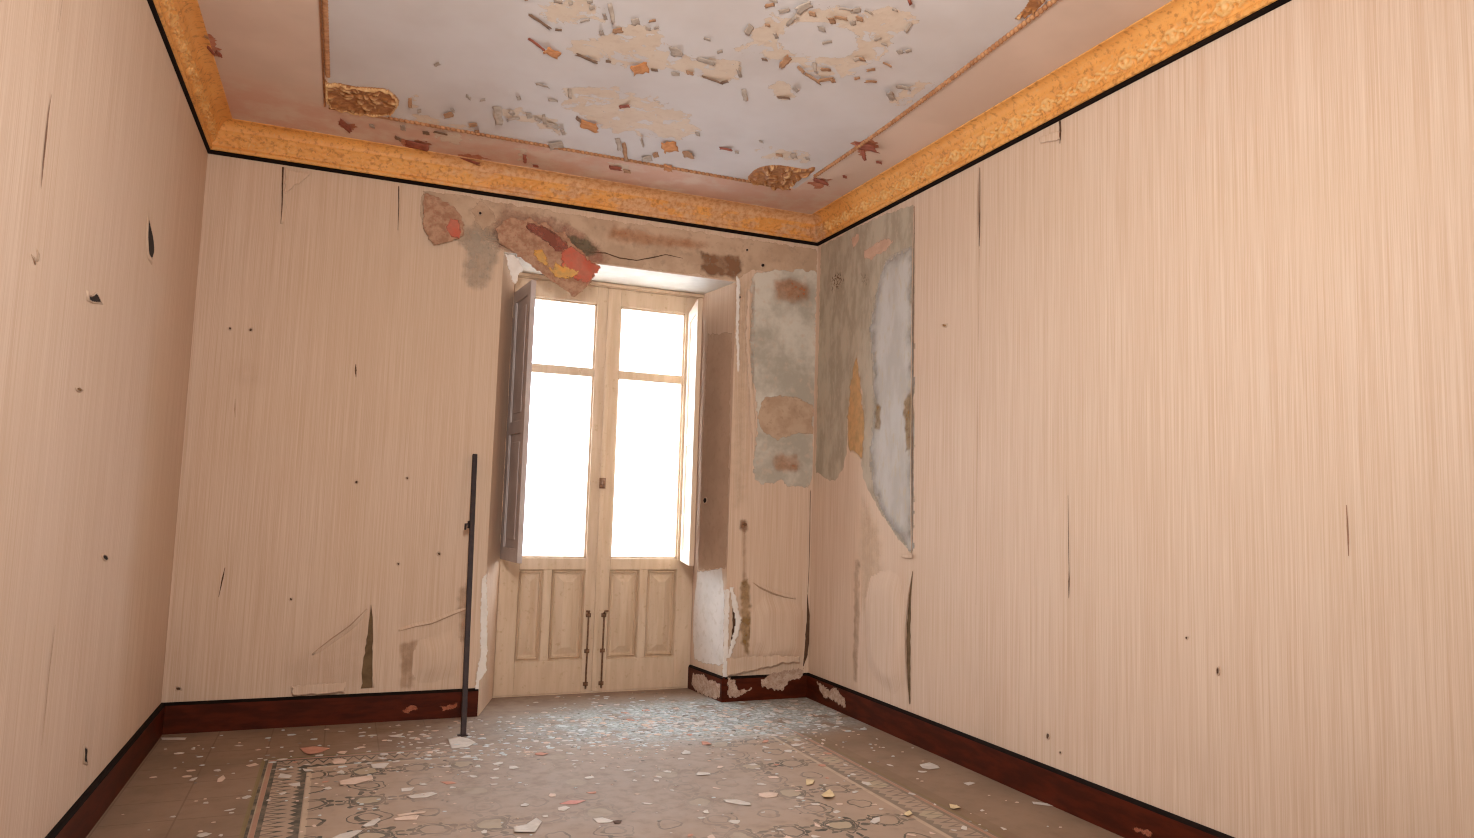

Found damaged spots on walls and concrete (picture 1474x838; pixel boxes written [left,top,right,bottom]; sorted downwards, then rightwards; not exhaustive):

peeling [394,0,933,173]
peeling [338,118,375,133]
peeling [719,140,847,189]
spalling [146,211,155,265]
flaking render [420,191,915,553]
damp [903,398,912,445]
peeling [692,668,846,708]